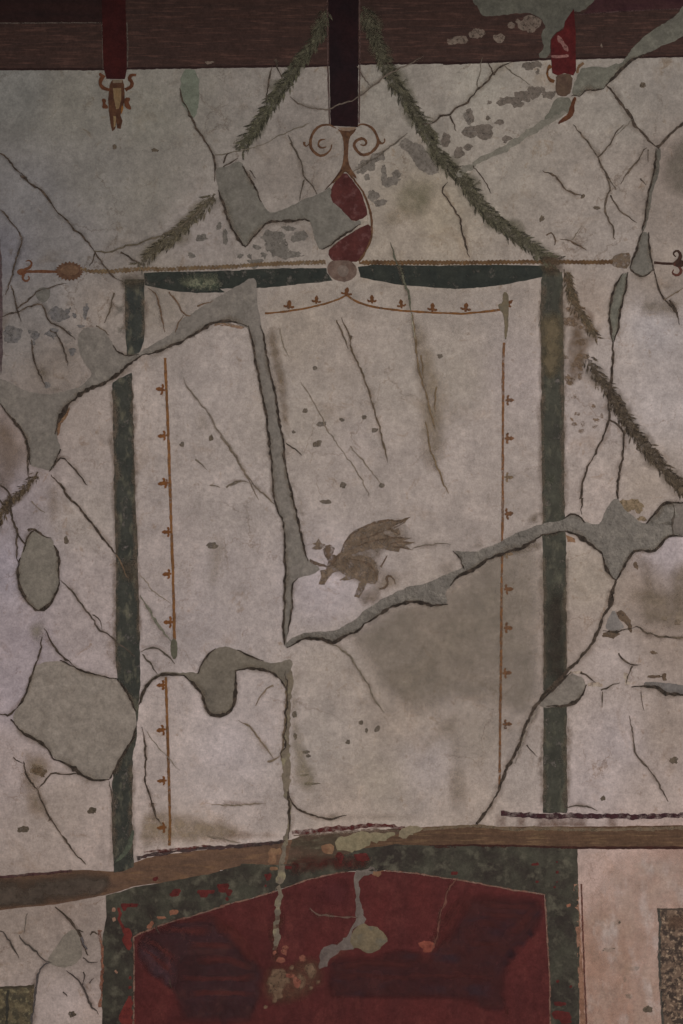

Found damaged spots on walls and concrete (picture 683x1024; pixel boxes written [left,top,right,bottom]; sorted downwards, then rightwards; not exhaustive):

peeling [447,15,542,45]
peeling [441,35,569,159]
peeling [398,138,439,175]
peeling [355,152,402,207]
peeling [188,222,228,258]
peeling [237,225,308,269]
peeling [3,303,90,345]
crack [0,54,683,863]
peeling [620,499,647,521]
peeling [602,610,632,639]
spalling [30,765,47,777]
spalling [264,924,320,1009]